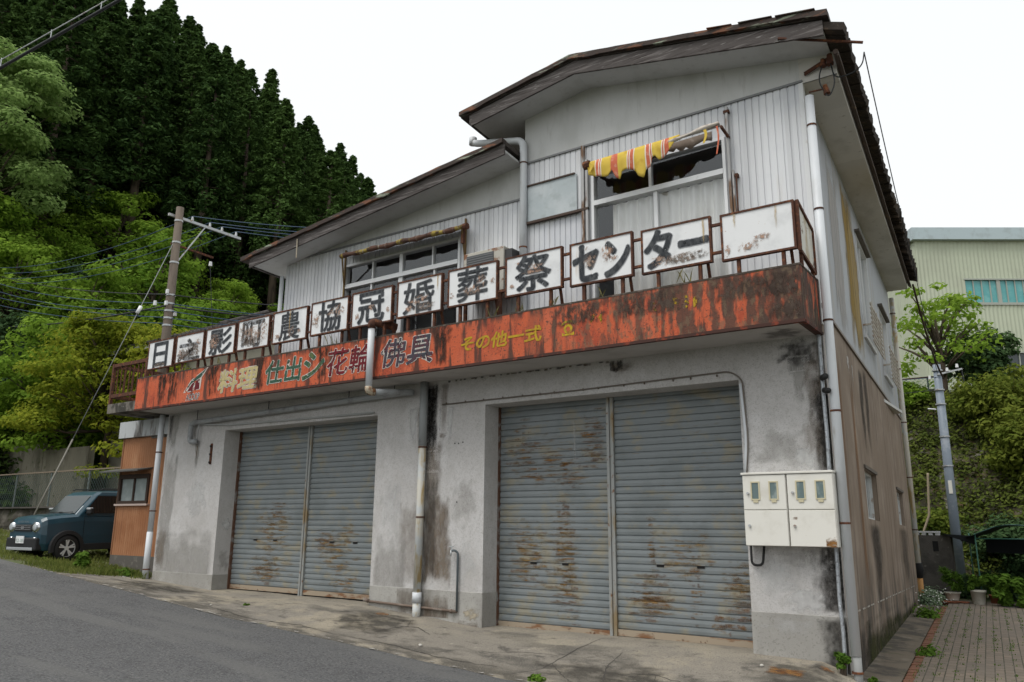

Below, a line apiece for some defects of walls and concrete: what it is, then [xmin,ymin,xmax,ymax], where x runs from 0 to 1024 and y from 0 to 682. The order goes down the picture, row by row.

water stain [783,343,834,470]
water stain [859,376,869,433]
water stain [410,386,453,581]
rust [511,506,576,604]
water stain [873,529,882,581]
water stain [423,600,447,618]